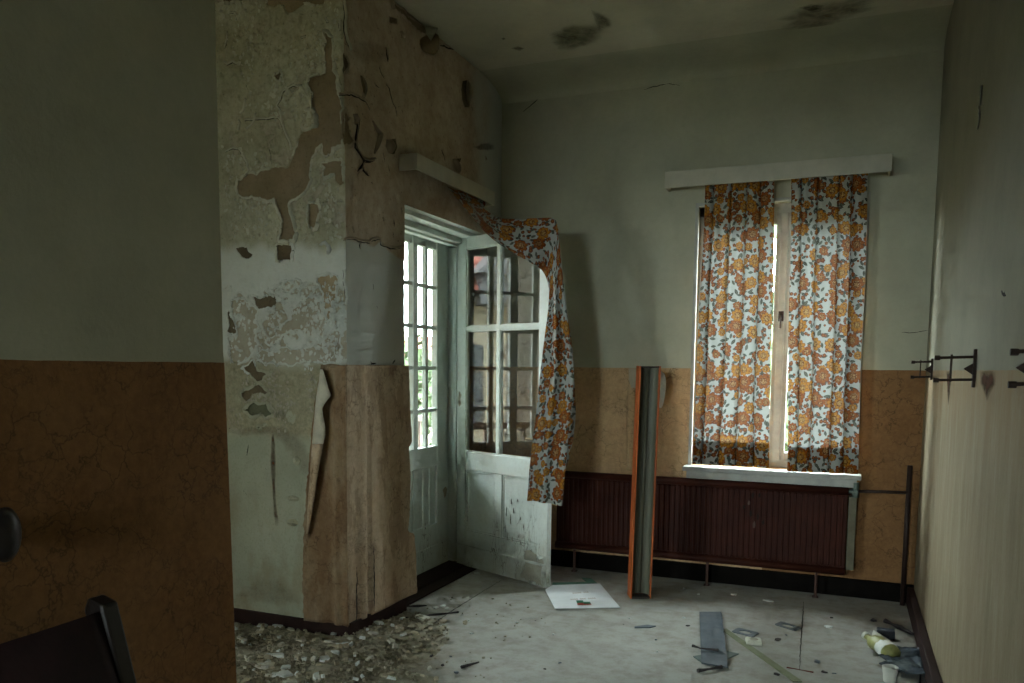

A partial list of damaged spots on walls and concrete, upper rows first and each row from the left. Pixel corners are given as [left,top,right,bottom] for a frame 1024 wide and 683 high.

spalling [234,29,397,263]
crack [338,0,398,176]
spalling [390,0,439,57]
peeling [224,271,344,420]